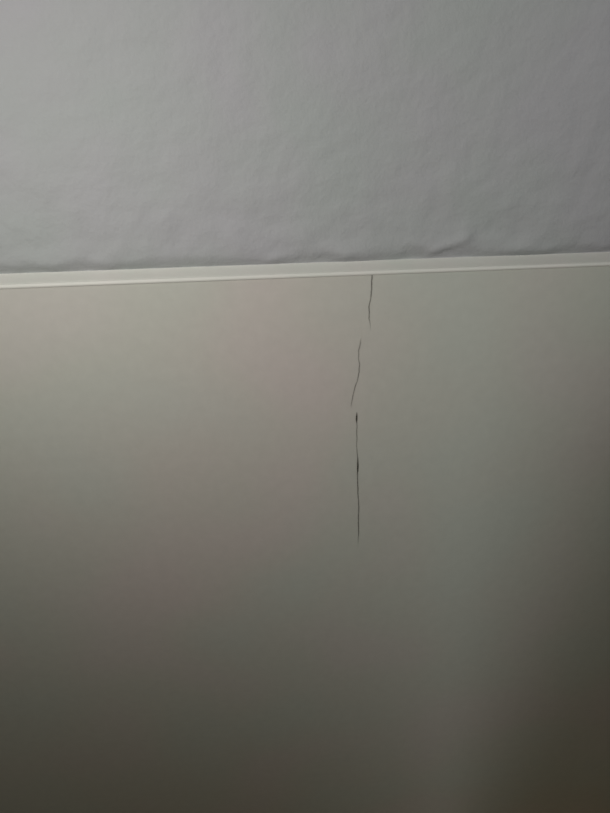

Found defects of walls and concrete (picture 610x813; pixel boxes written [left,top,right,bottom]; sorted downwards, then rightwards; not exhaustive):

crack [354,454,362,535]